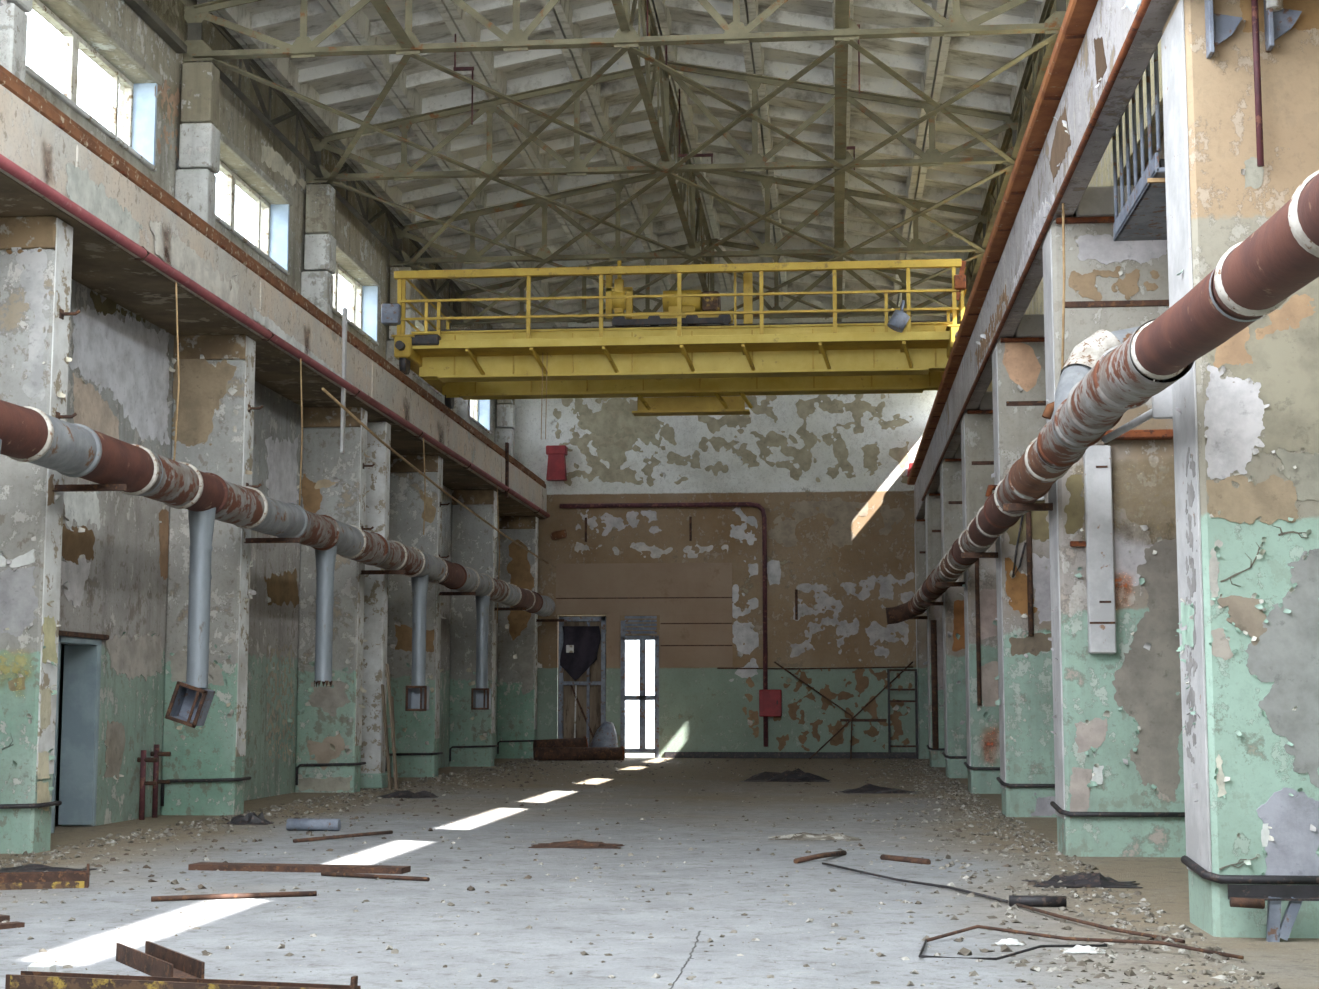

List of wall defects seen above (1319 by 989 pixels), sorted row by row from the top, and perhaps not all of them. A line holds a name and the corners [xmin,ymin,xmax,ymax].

peeling [6,247,238,447]
peeling [553,394,912,487]
rust [1101,429,1173,440]
peeling [574,497,914,751]
peeling [1031,277,1319,885]
crack [1220,526,1313,587]